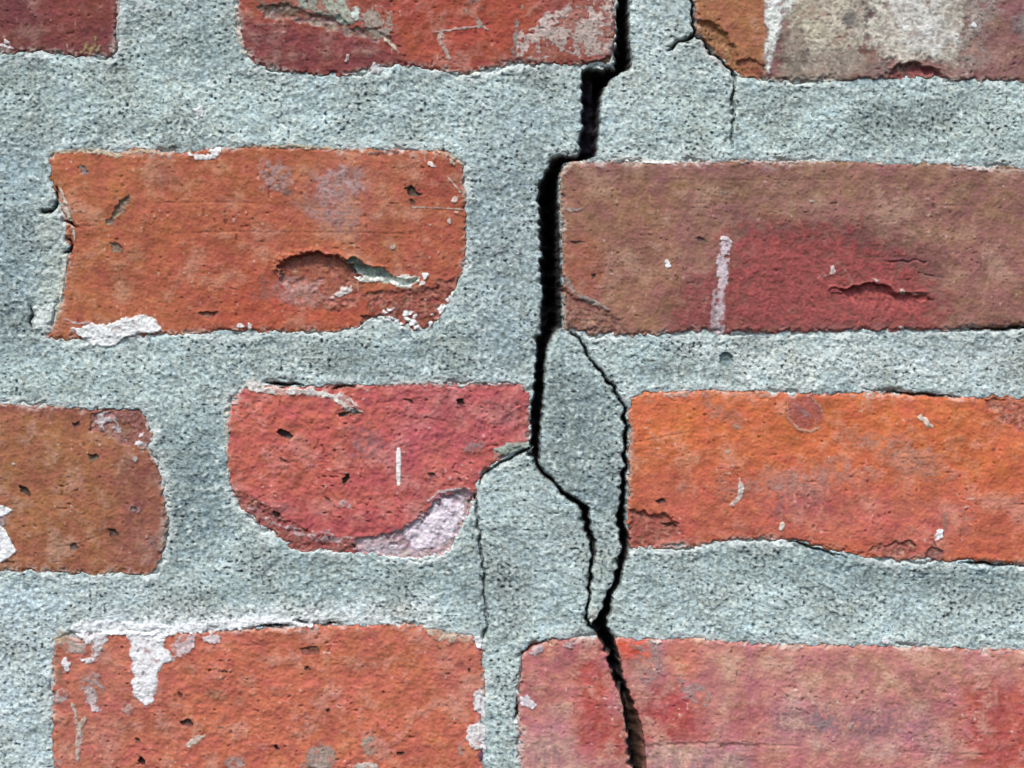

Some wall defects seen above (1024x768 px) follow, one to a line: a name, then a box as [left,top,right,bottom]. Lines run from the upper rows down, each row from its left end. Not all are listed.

crack [666,0,738,149]
spalling [277,252,457,329]
crack [473,0,646,768]
spalling [233,487,476,559]